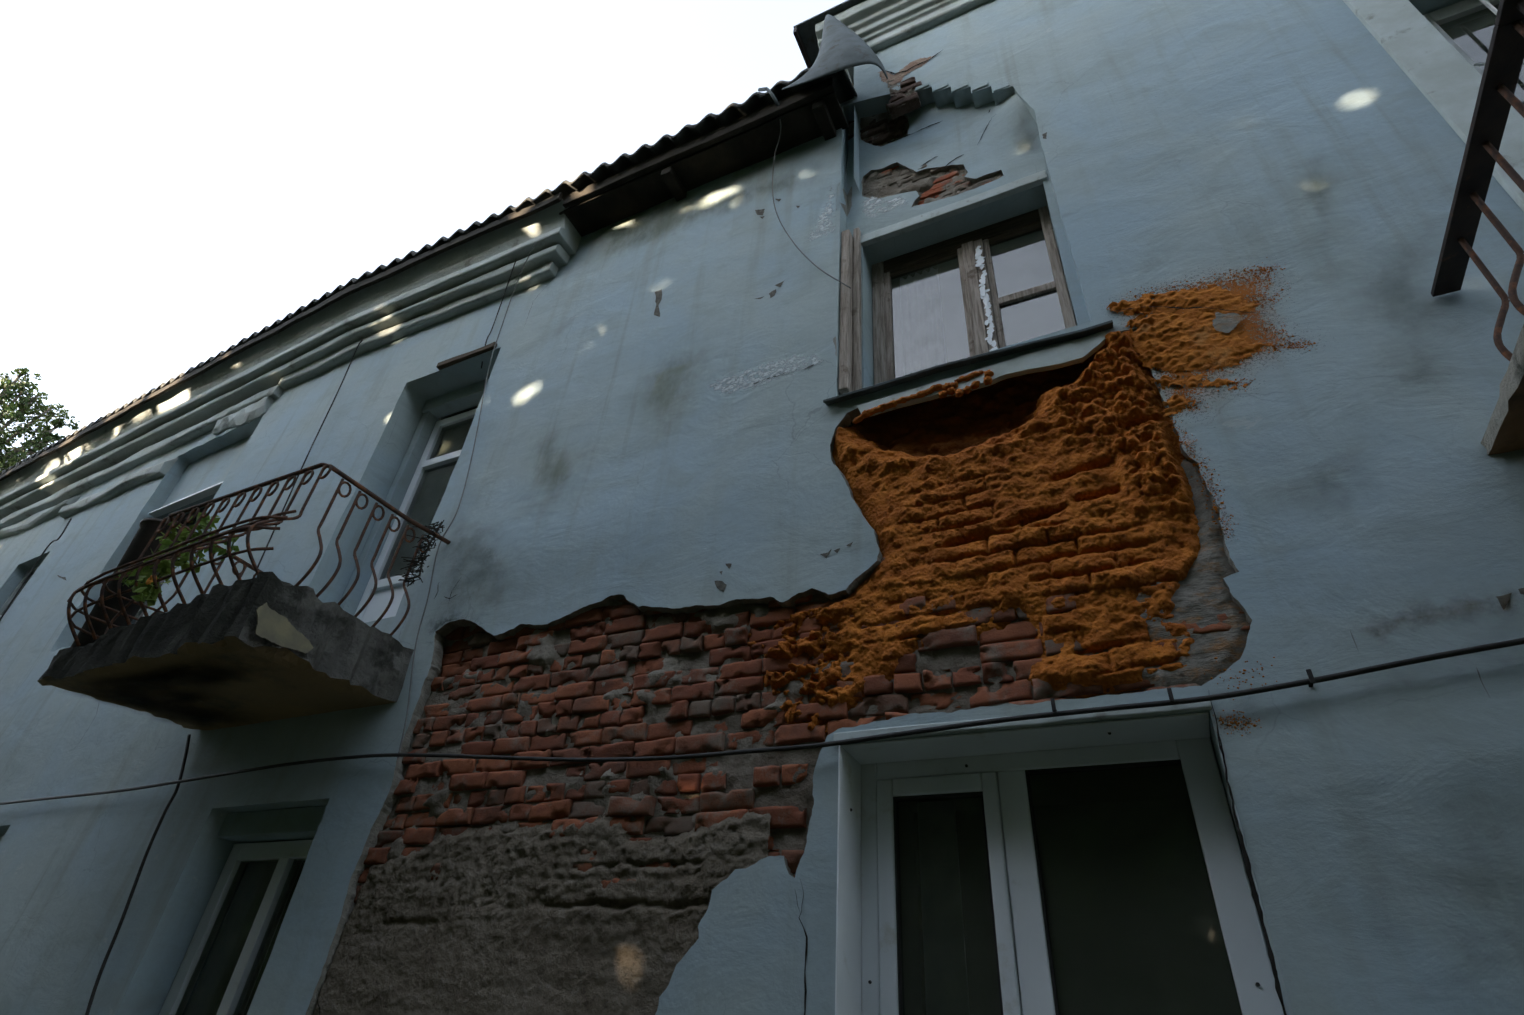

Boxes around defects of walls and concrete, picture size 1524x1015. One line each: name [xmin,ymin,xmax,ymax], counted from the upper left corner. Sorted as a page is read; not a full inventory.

spalling [848,51,941,147]
spalling [836,164,1003,216]
spalling [654,289,662,317]
peeling [975,246,998,351]
spalling [1212,312,1243,333]
spalling [849,352,1097,457]
spalling [313,459,1250,1015]
crack [795,880,808,1015]